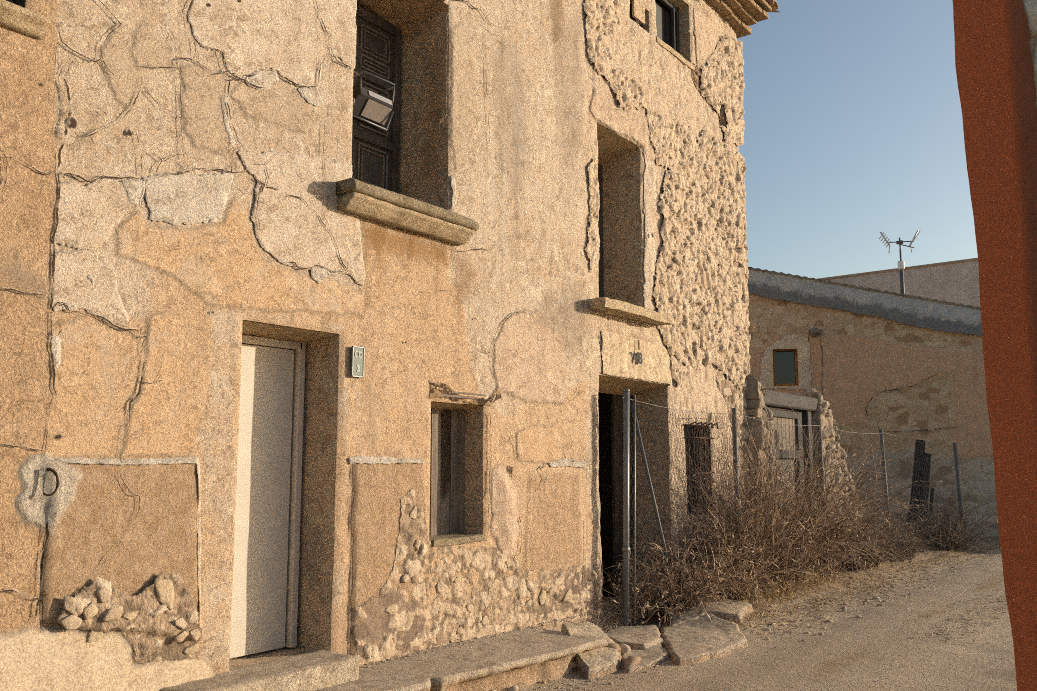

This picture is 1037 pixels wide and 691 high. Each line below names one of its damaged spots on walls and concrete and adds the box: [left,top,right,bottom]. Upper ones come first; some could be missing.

crack [0,0,360,568]
spalling [583,0,751,494]
crack [1,522,49,621]
spalling [57,572,203,664]
spalling [351,488,607,666]